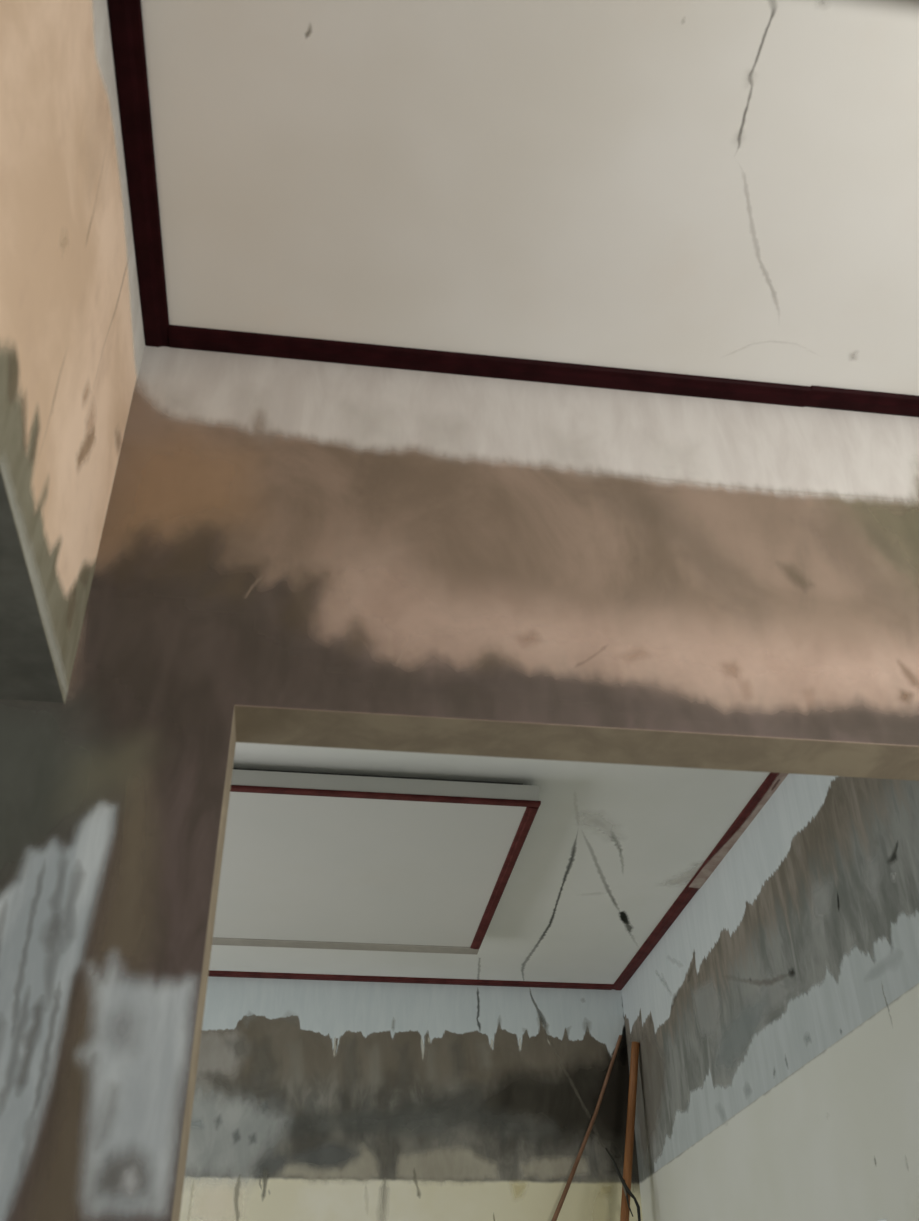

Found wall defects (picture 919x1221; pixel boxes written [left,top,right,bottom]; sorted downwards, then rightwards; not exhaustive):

crack [738,8,775,148]
leakage [0,442,919,1221]
crack [522,815,632,1034]